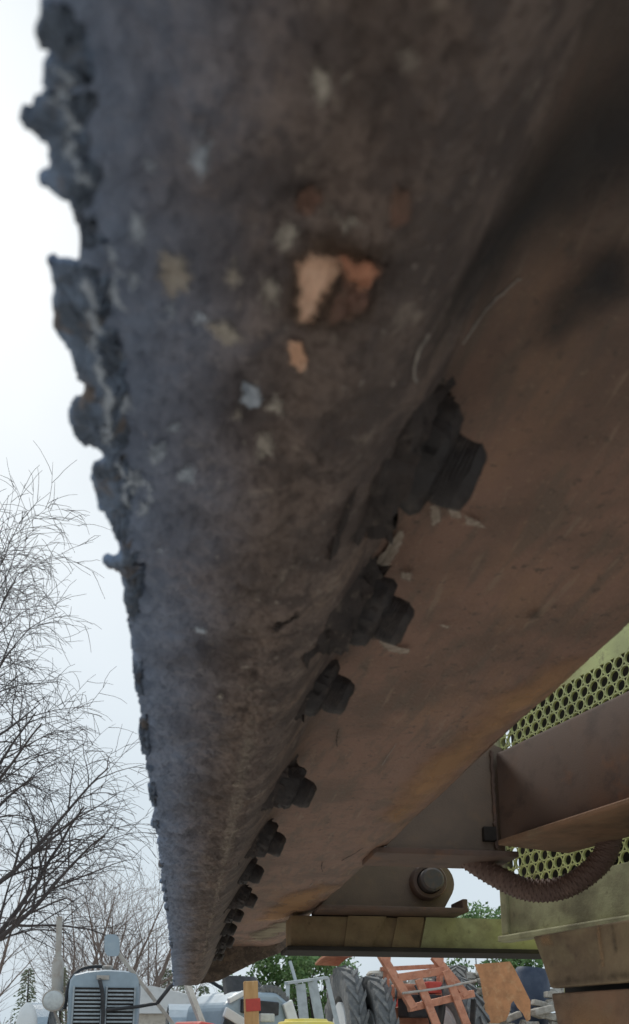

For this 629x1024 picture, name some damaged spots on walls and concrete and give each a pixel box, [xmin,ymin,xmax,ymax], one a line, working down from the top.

peeling [291,239,380,328]
peeling [288,341,308,372]